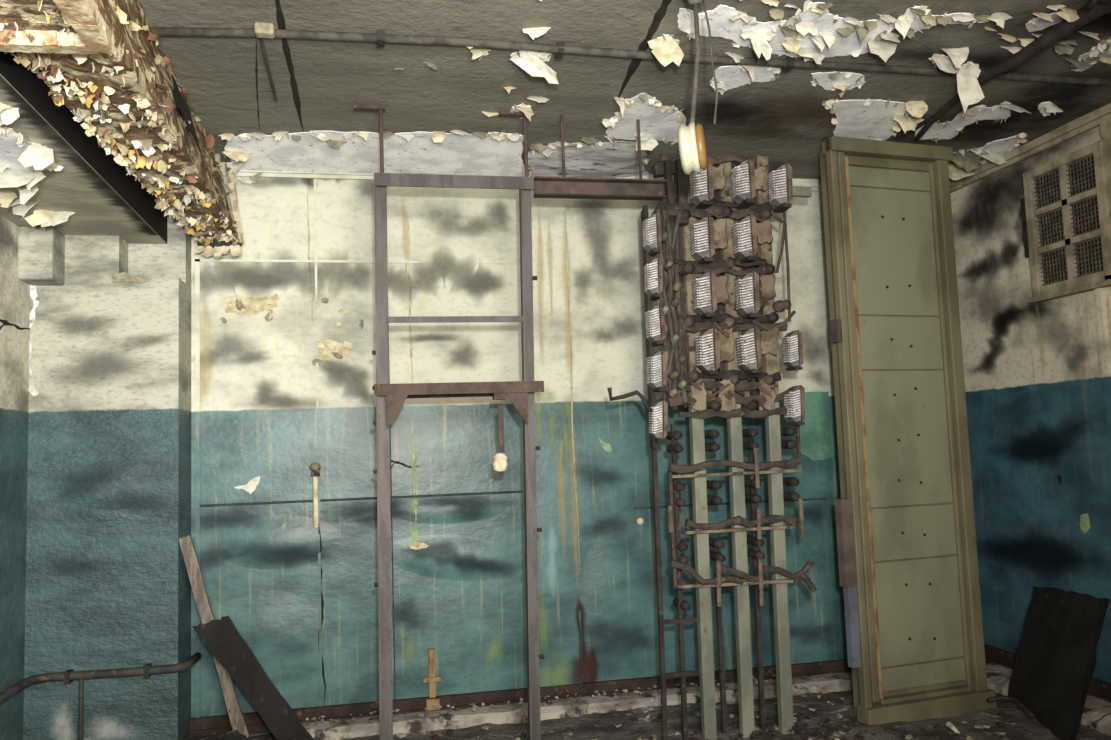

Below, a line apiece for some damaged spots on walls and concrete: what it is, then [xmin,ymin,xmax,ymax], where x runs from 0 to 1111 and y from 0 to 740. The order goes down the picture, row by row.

peeling [648,0,1111,180]
peeling [0,0,686,259]
leakage [959,206,1002,234]
crack [0,319,30,330]
peeling [220,294,279,324]
leakage [996,312,1012,327]
leakage [1028,302,1046,317]
peeling [312,339,354,366]
crack [318,529,326,706]
rust [574,601,597,684]